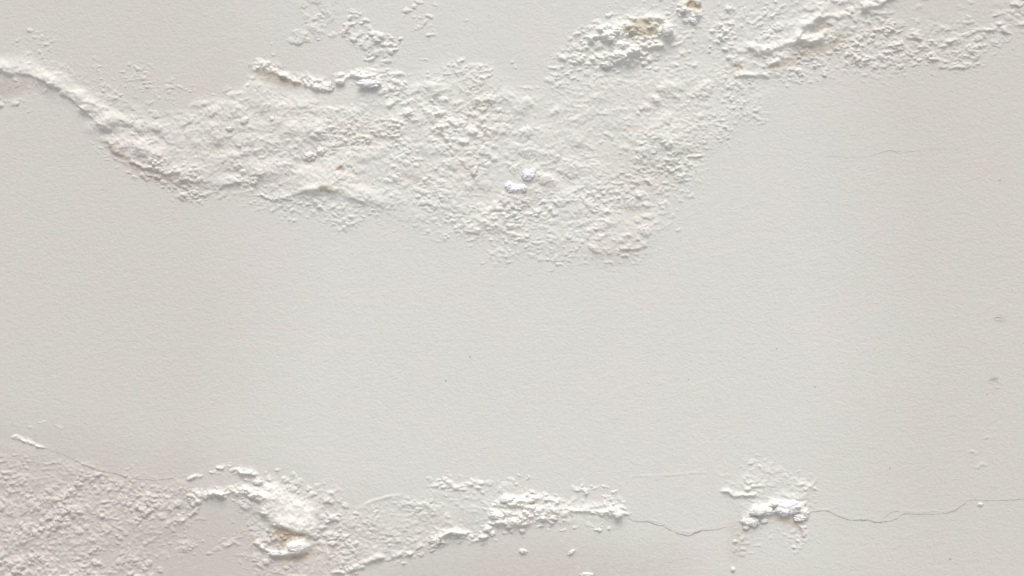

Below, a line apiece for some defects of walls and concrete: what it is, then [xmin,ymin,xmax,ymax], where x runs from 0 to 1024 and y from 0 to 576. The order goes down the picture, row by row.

crack [808,499,1020,523]
crack [628,518,726,536]